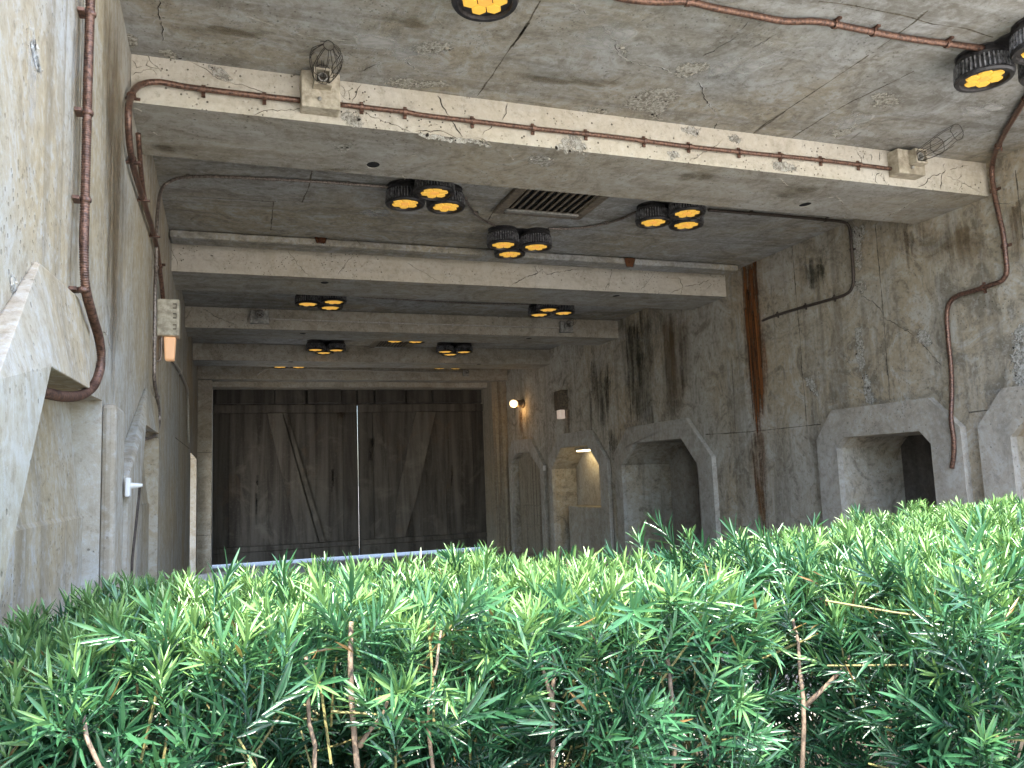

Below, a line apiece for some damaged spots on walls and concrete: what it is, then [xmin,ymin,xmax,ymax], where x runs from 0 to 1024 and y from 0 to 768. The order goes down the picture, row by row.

crack [132,0,300,116]
crack [340,51,514,180]
leakage [626,314,653,418]
corrosion [742,262,767,531]